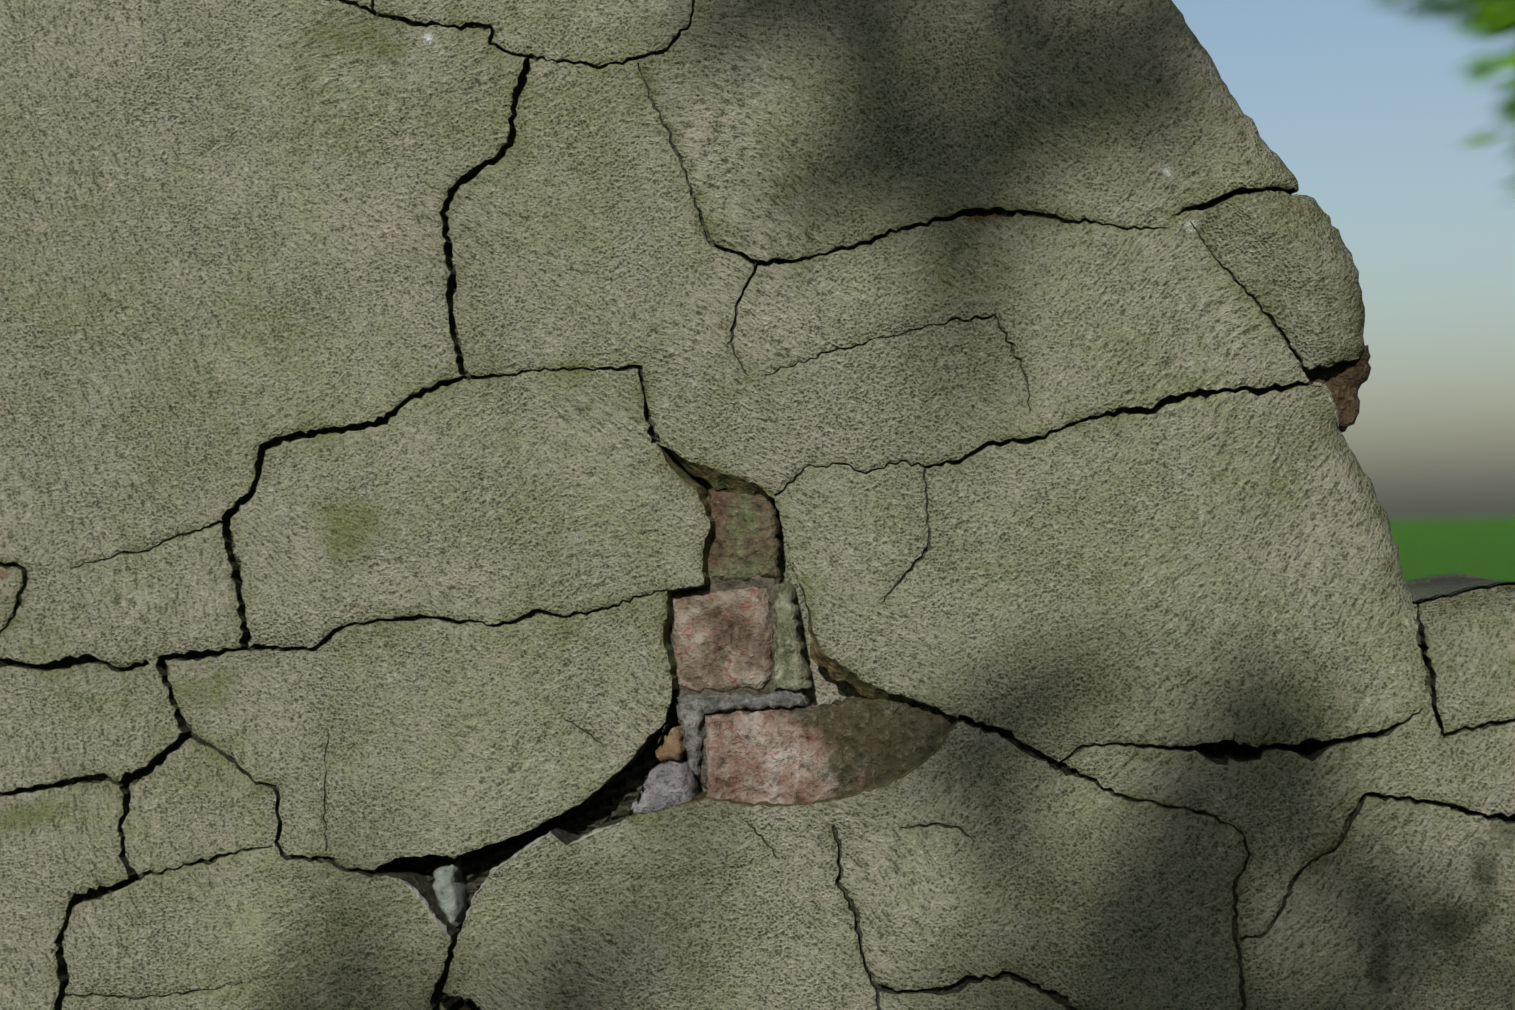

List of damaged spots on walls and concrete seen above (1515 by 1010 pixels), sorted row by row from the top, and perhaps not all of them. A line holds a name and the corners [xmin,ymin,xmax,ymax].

crack [0,0,1167,1010]
spalling [628,443,961,817]
crack [774,186,1313,602]
crack [958,601,1515,1010]